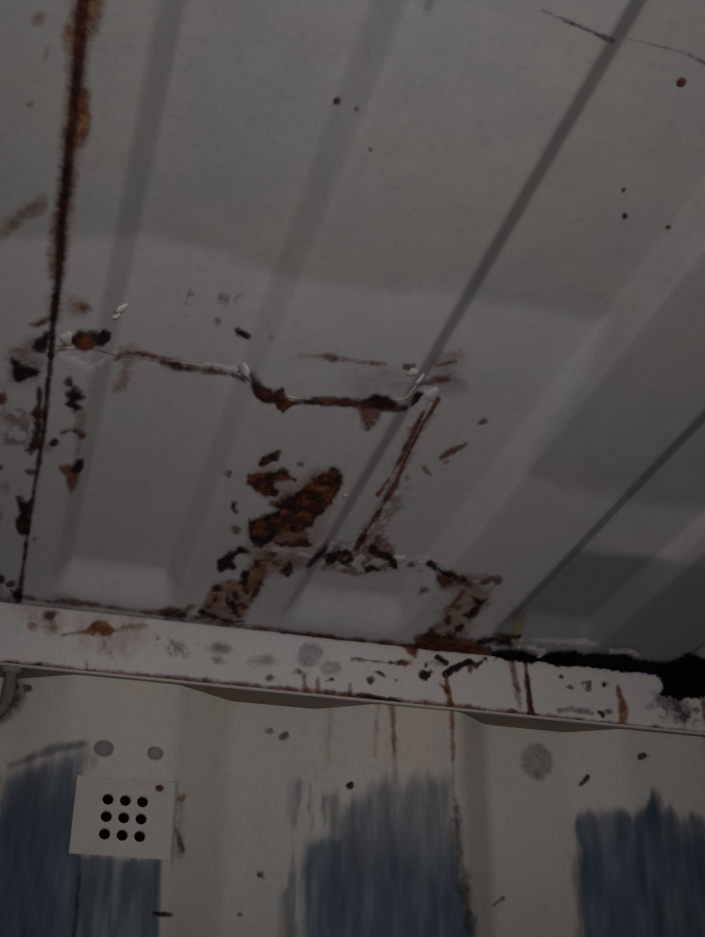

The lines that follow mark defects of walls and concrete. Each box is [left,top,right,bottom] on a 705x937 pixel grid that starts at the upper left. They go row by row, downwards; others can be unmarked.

rust [0,0,111,620]
rust [115,352,449,430]
rust [2,397,705,751]
peeling [517,638,597,658]
peeling [609,648,641,657]